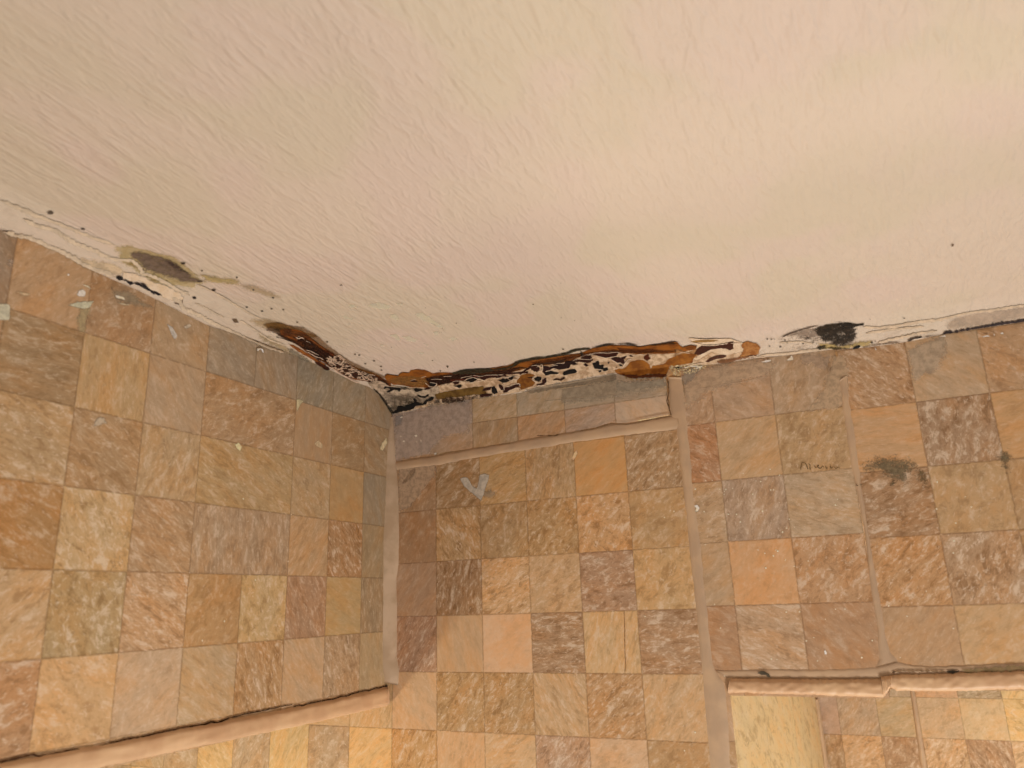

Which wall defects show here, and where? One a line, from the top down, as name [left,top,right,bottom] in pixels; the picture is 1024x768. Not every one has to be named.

leakage [117,246,239,299]
crack [116,276,183,305]
leakage [767,322,887,350]
crack [862,319,1024,348]
peeling [864,305,1024,350]
peeling [296,336,824,414]
leakage [862,457,927,486]